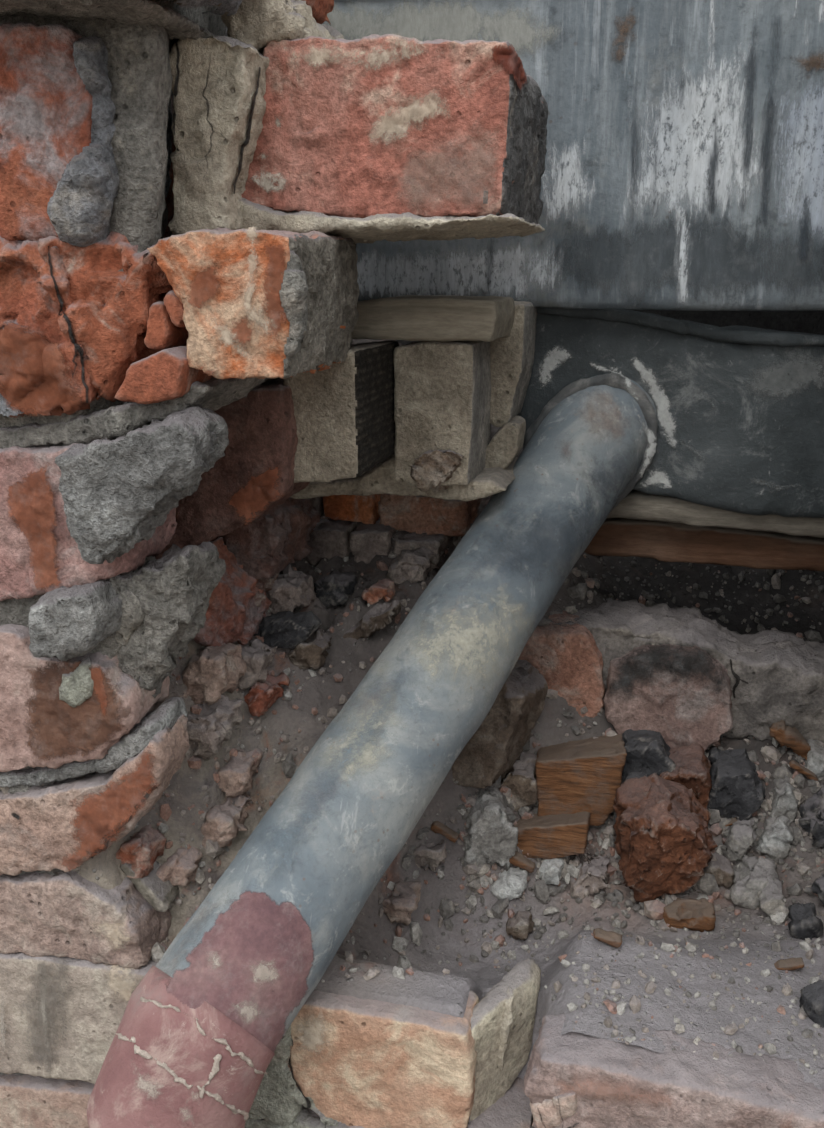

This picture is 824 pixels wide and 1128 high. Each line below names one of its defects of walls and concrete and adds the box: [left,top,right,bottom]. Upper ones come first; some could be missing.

crack [173,41,261,194]
water stain [357,0,824,302]
crack [48,246,89,403]
efflorescence [539,346,571,383]
water stain [590,359,699,488]
peeling [237,1004,257,1021]
peeling [253,963,276,981]